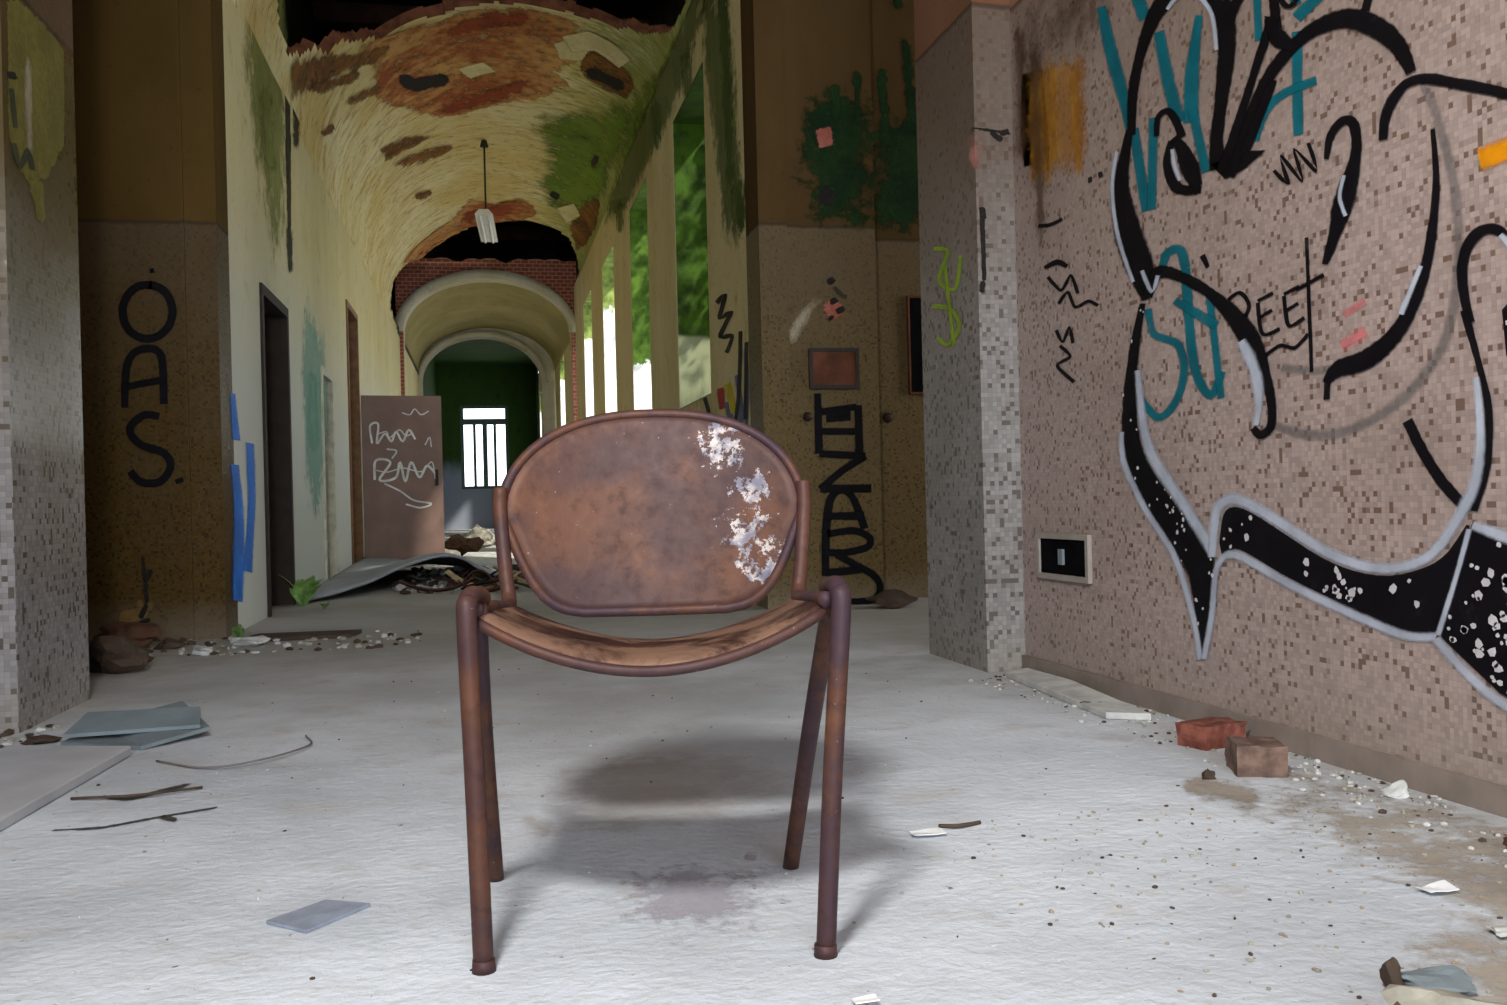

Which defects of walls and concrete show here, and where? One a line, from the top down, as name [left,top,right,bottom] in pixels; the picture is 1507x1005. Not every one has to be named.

flaking render [292,8,634,117]
leakage [718,0,747,231]
leakage [829,39,917,150]
flaking render [381,136,452,167]
flaking render [404,199,536,263]
flaking render [550,191,600,250]
leakage [633,864,756,922]